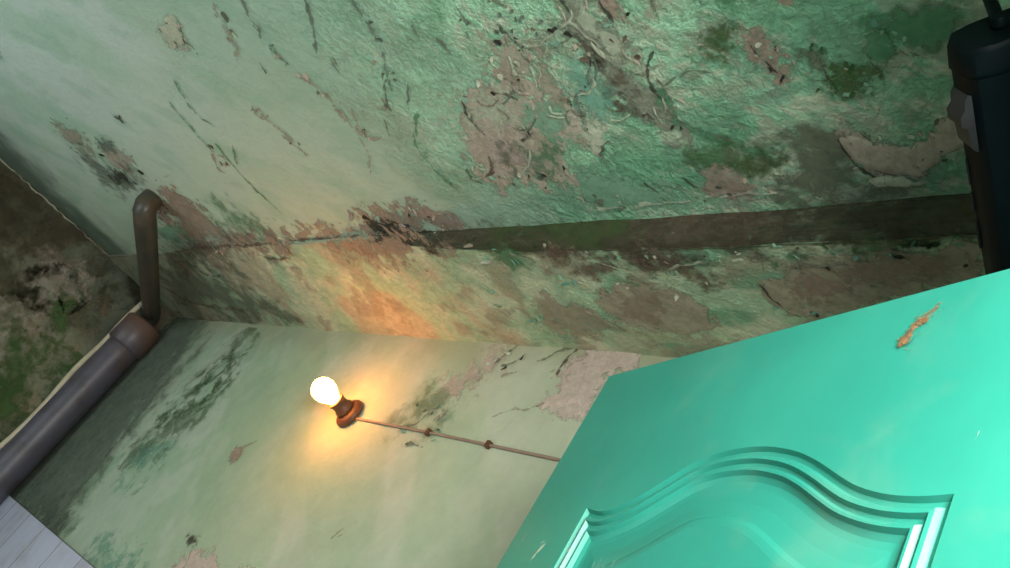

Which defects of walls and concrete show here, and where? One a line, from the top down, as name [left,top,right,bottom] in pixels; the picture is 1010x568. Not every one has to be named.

peeling [155,13,198,57]
peeling [698,23,795,90]
peeling [437,0,693,197]
peeling [52,118,144,190]
flaking render [834,117,964,188]
flaking render [320,196,473,274]
peeling [481,249,535,271]
flaking render [526,280,720,421]
flaking render [171,534,219,568]